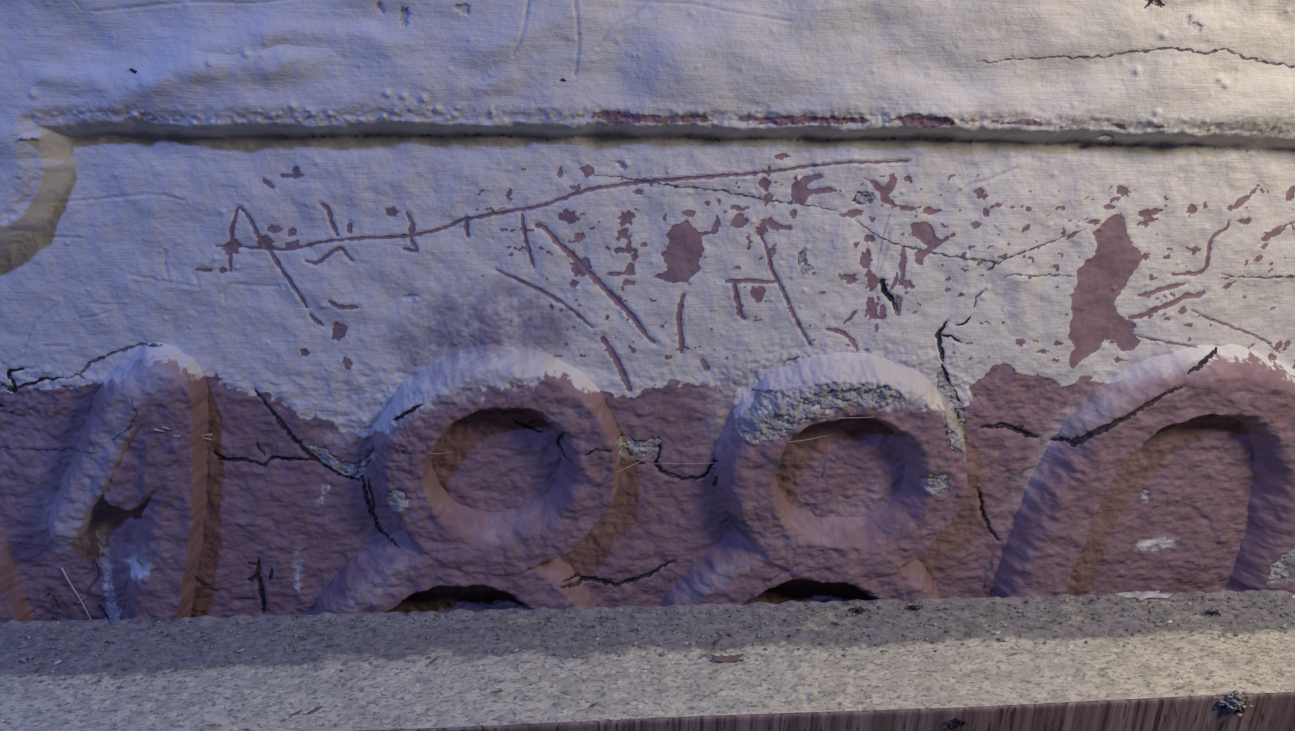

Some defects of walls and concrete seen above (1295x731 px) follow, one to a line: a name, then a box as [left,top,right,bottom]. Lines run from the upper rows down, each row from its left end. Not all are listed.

crack [1144,0,1165,8]
crack [977,47,1295,68]
peeling [558,209,585,241]
peeling [570,256,592,288]
peeling [607,210,648,286]
peeling [654,153,956,325]
peeling [332,322,348,341]
peeling [937,186,1163,454]
crack [215,389,400,548]
crack [495,408,718,487]
flaking render [735,382,904,444]
crack [596,175,1218,591]